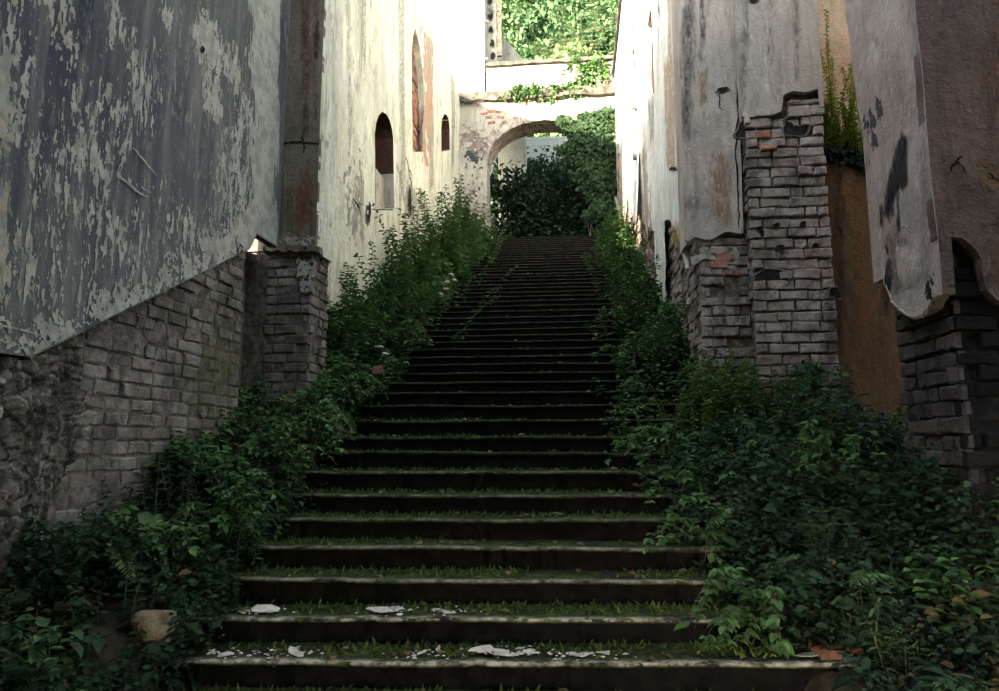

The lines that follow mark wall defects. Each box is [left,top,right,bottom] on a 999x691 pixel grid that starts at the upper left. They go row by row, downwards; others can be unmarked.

peeling [0,0,320,355]
crack [950,156,999,181]
flaking render [691,99,842,406]
flaking render [883,242,936,320]
peeling [0,461,19,500]